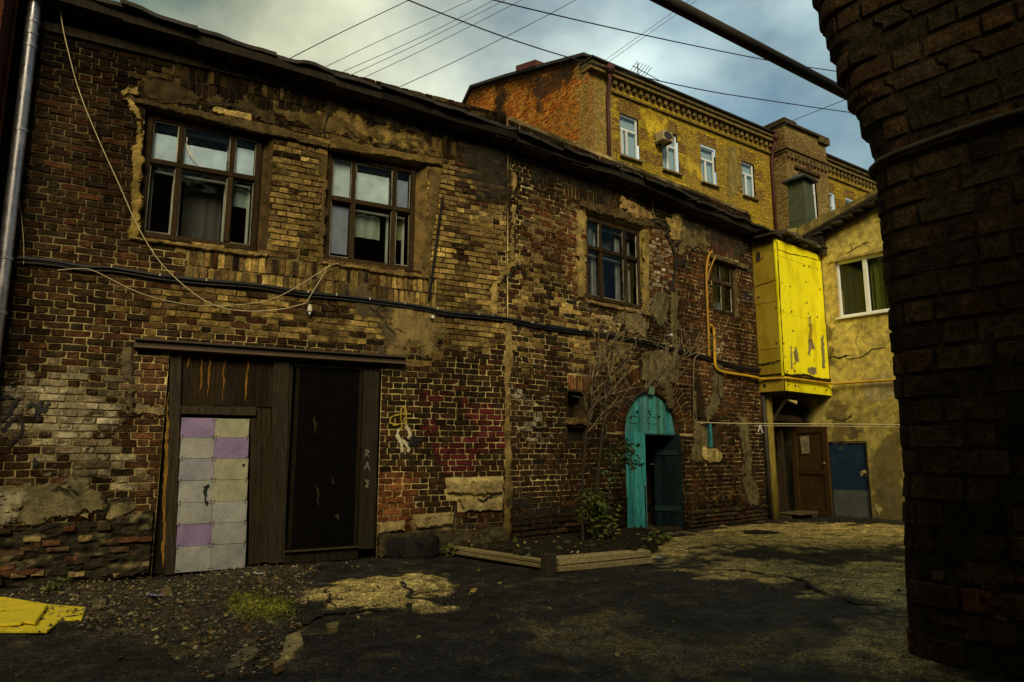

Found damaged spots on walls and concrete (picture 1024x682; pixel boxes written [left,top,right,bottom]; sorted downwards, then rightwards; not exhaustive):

flaking render [119,87,145,124]
flaking render [212,107,252,121]
peeling [620,196,713,255]
peeling [790,335,825,375]
crack [829,331,885,360]
peeling [702,446,722,463]
spalling [0,479,153,588]